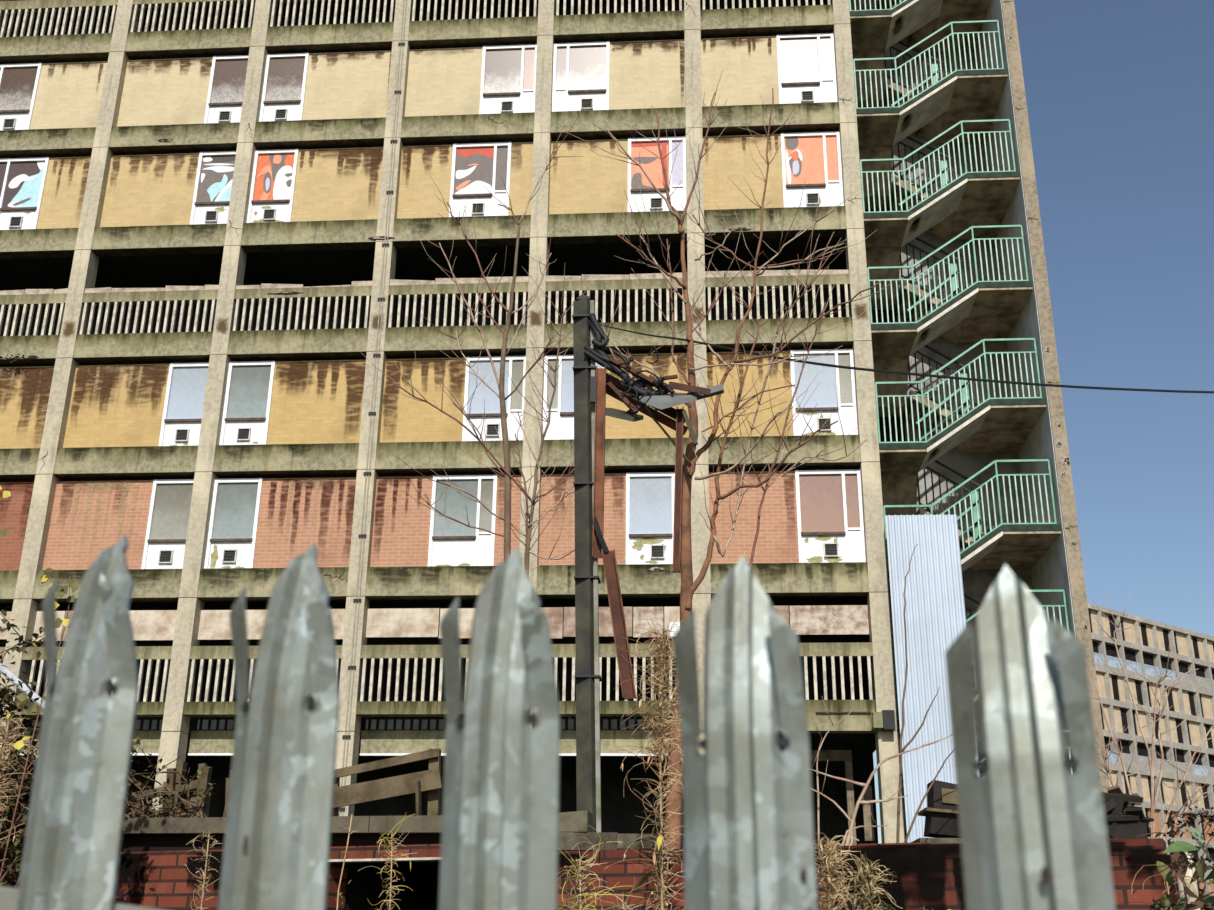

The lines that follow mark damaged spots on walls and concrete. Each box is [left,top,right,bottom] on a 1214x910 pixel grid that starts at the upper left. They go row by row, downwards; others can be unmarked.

water stain [113,155,199,176]
water stain [300,148,383,192]
water stain [0,367,54,434]
water stain [71,365,168,414]
water stain [277,361,366,429]
water stain [269,479,356,531]